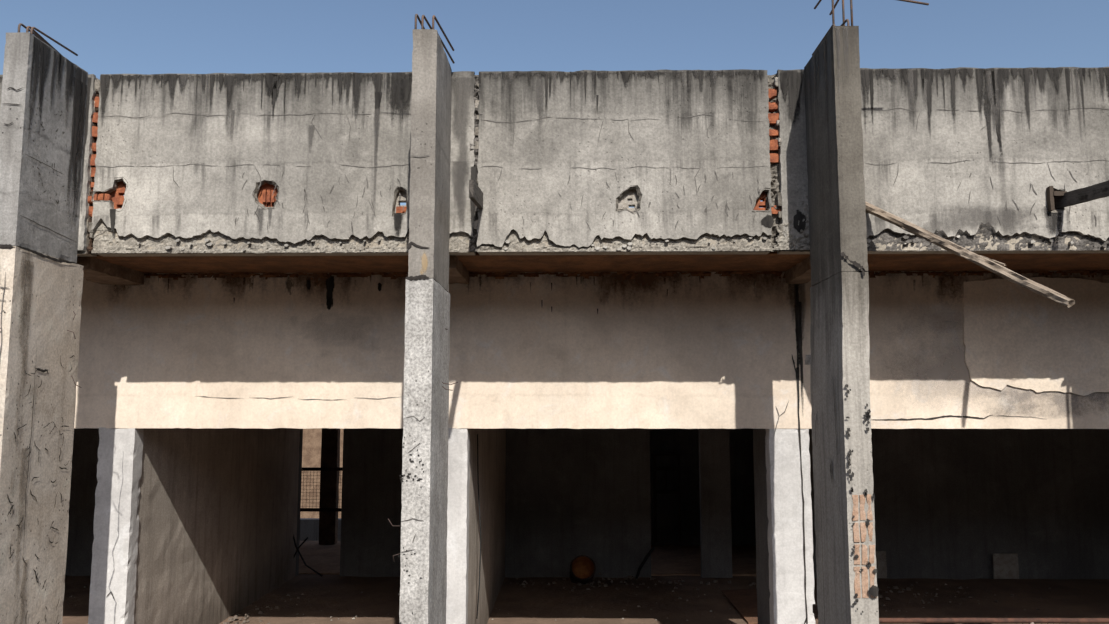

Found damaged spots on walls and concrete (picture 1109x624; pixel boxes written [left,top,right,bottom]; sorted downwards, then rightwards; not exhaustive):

spalling [92,177,128,212]
damp [29,37,412,218]
spalling [77,220,409,254]
damp [453,70,764,228]
spalling [616,185,642,213]
spalling [449,195,810,253]
damp [780,27,848,123]
damp [861,67,1109,158]
spalling [867,224,1109,251]
damp [789,283,804,409]
peeling [963,277,1109,396]
crack [871,413,1043,421]